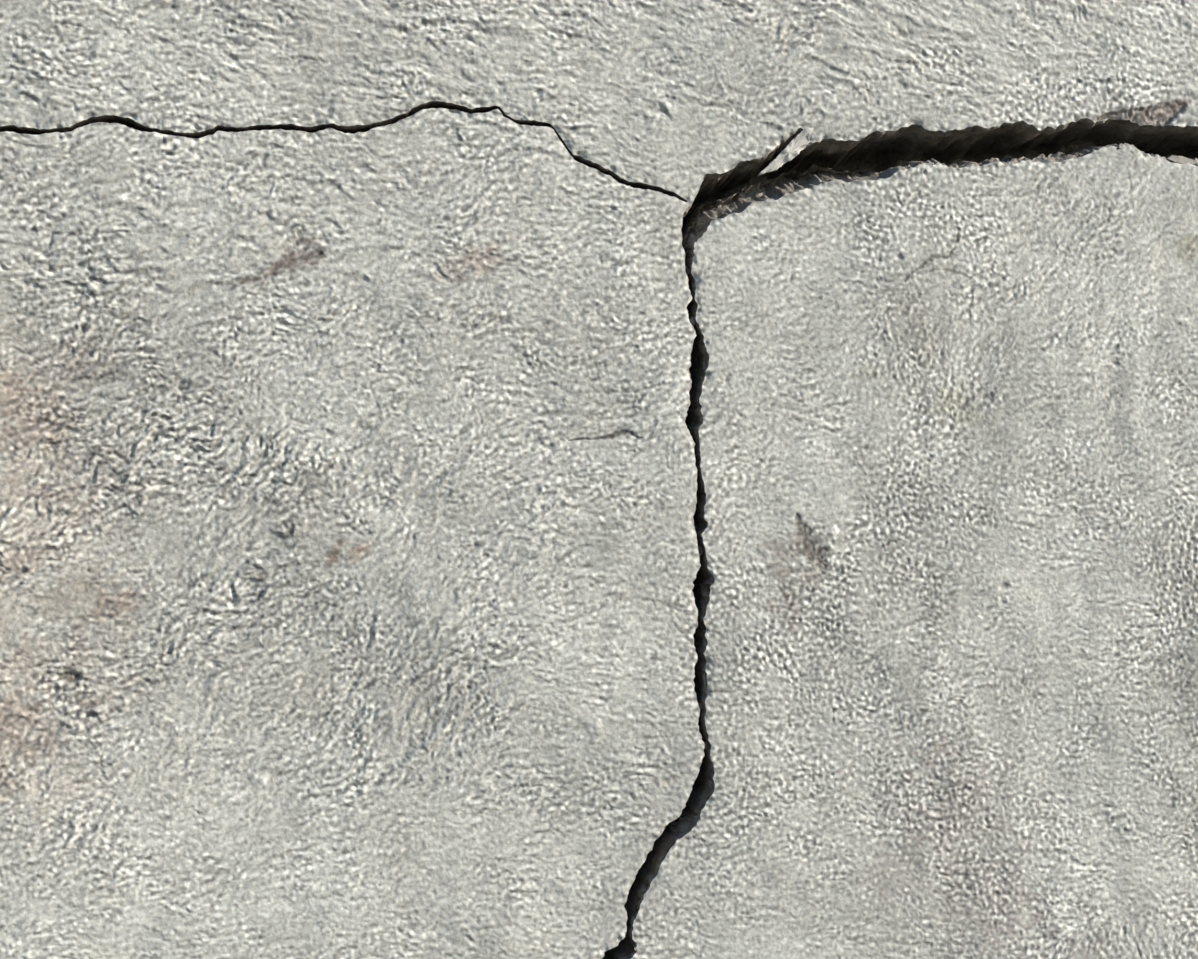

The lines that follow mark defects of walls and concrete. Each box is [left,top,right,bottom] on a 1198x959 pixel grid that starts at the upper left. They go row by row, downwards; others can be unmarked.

crack [0,100,1198,251]
crack [569,430,643,441]
crack [602,249,715,959]